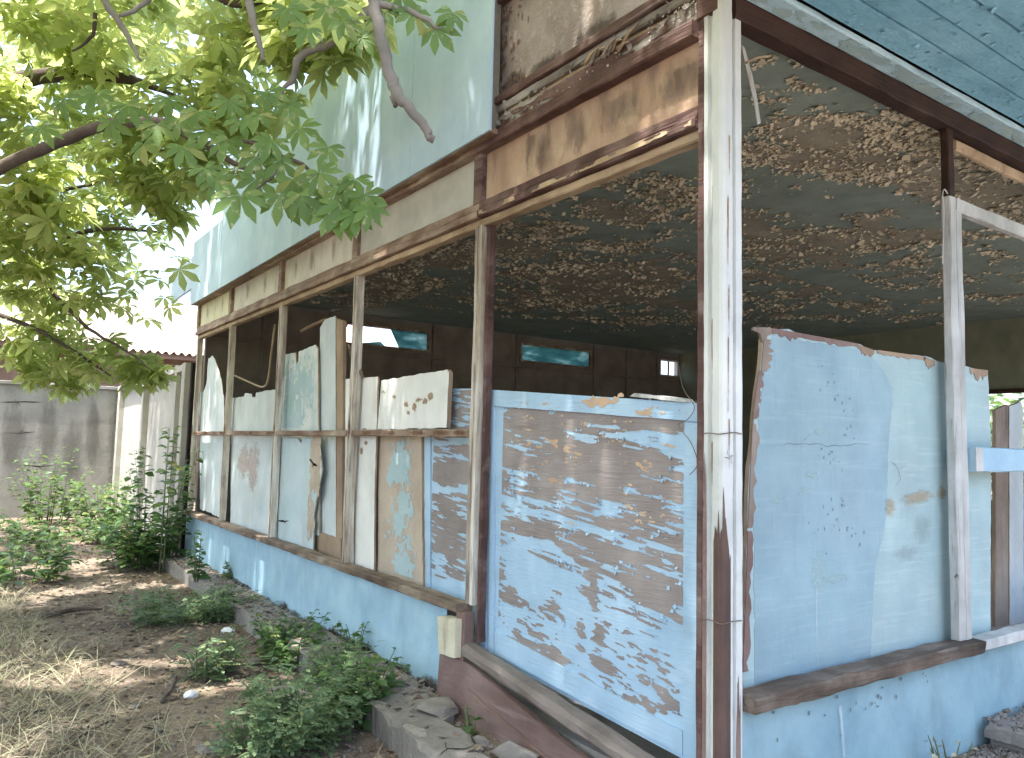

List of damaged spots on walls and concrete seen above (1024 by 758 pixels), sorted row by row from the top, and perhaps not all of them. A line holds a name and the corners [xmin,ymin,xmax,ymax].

water stain [577,18,613,40]
peeling [496,0,694,129]
peeling [750,0,1024,143]
peeling [532,131,667,192]
peeling [309,238,475,314]
peeling [494,167,698,337]
peeling [383,390,433,415]
peeling [702,54,1024,758]
peeling [384,437,416,578]
peeling [431,390,471,581]
peeling [498,393,687,716]